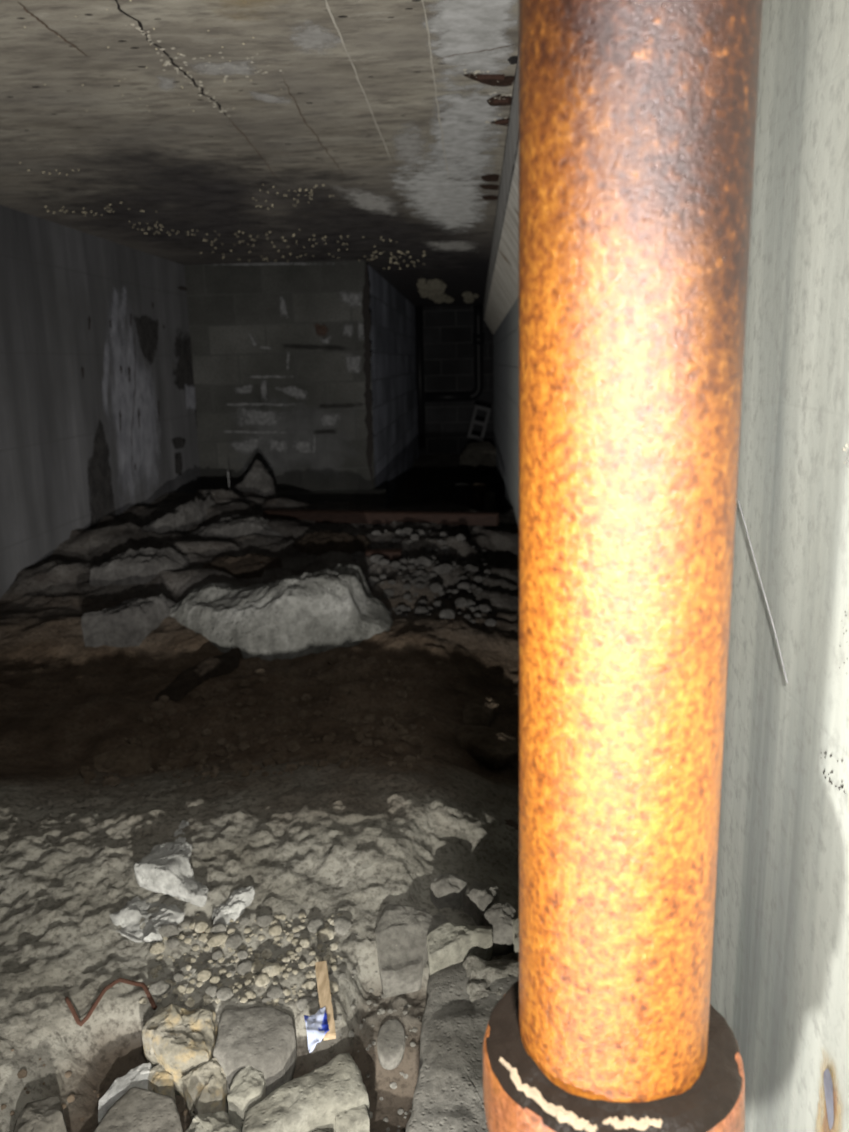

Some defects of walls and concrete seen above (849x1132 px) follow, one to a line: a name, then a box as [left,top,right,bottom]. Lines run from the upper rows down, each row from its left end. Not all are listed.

crack [17,1,90,58]
crack [115,0,274,175]
leakage [69,0,517,272]
leakage [88,288,197,529]